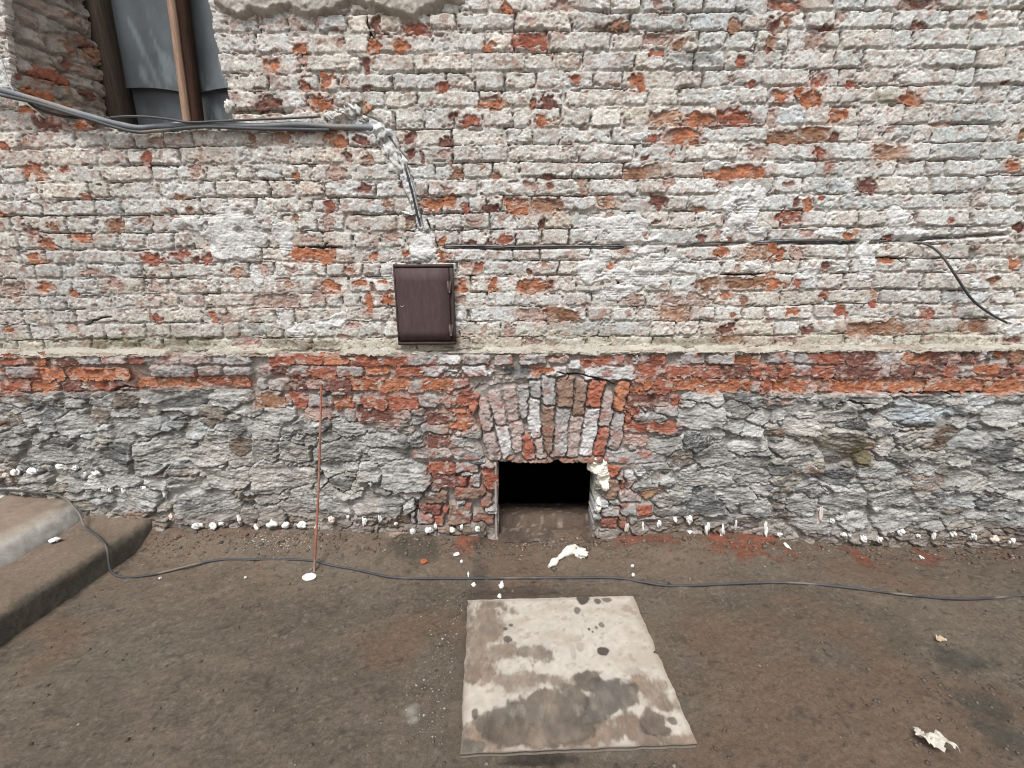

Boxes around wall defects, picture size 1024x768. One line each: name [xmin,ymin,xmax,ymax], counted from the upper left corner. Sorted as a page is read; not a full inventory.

spalling [512,32,547,51]
spalling [7,64,96,145]
spalling [645,107,750,158]
spalling [703,70,849,187]
spalling [254,246,336,308]
spalling [0,351,478,449]
spalling [532,354,558,373]
crack [559,372,614,384]
spalling [580,355,613,368]